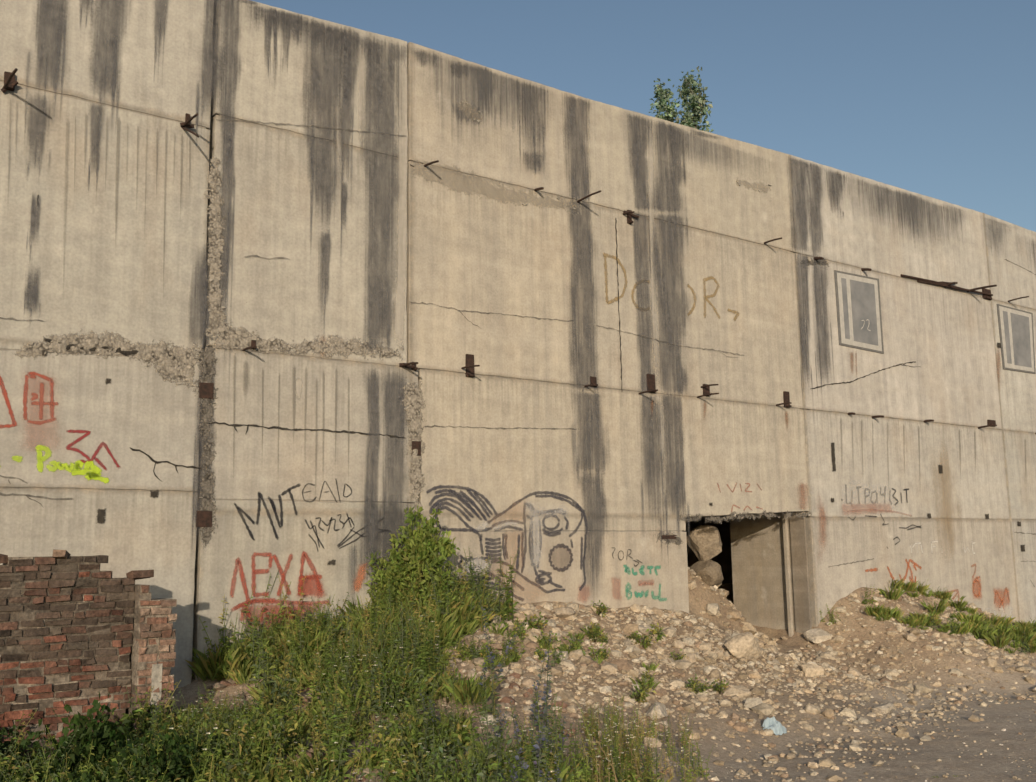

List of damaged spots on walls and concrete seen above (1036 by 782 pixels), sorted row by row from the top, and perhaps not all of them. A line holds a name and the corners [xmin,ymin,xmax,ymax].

crack [130,447,201,481]
damp [193,402,212,520]
spalling [15,157,404,545]
damp [191,0,408,348]
damp [351,372,409,584]
crack [208,422,576,439]
damp [451,64,545,170]
damp [565,97,605,568]
damp [630,116,730,519]
damp [790,159,842,377]
crack [811,361,920,389]